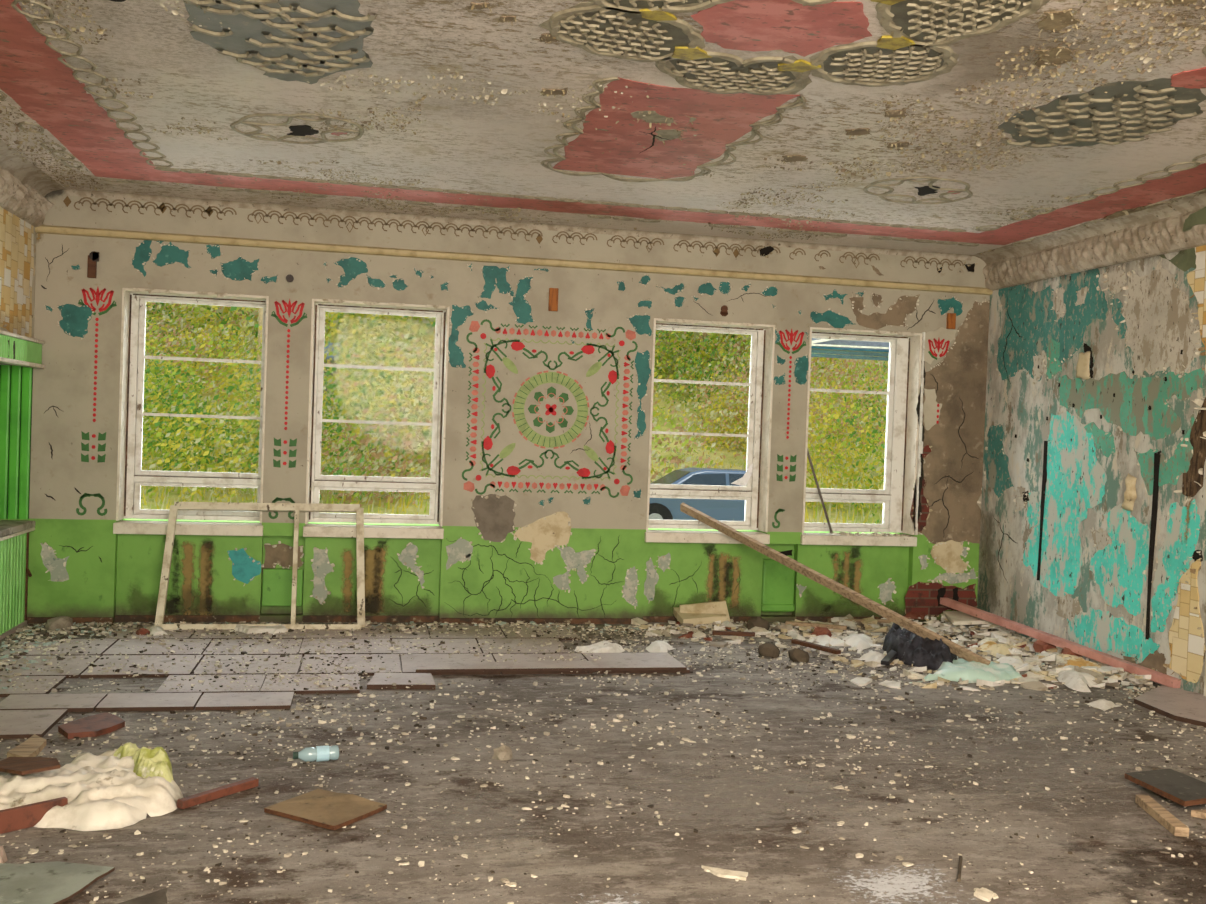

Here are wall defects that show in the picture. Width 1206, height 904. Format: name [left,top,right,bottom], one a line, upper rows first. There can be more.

peeling [307,69,697,154]
flaking render [964,188,1206,272]
peeling [322,257,549,368]
crack [914,361,978,532]
flaking render [40,542,69,582]
leakage [166,557,179,614]
leakage [204,541,213,611]
flaking render [227,541,335,605]
crack [390,537,624,618]
crack [669,561,702,609]
leakage [712,563,732,600]
leakage [838,546,860,590]